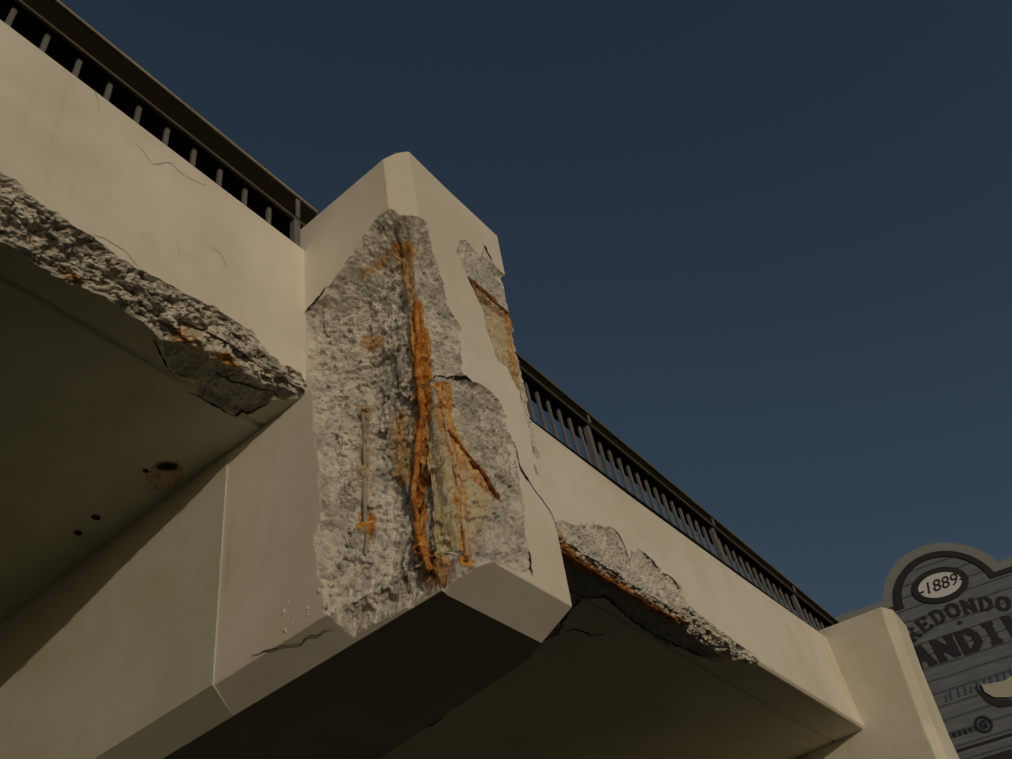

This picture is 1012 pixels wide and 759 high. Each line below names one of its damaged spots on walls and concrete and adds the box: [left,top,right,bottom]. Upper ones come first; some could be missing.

corrosion [173,325,241,372]
crack [154,337,279,417]
spalling [0,171,540,637]
corrosion [356,241,497,589]
corrosion [468,277,522,397]
crack [513,443,562,533]
crack [252,629,329,656]
corrosion [557,530,686,625]
crack [545,595,722,663]
flaking render [545,520,760,665]